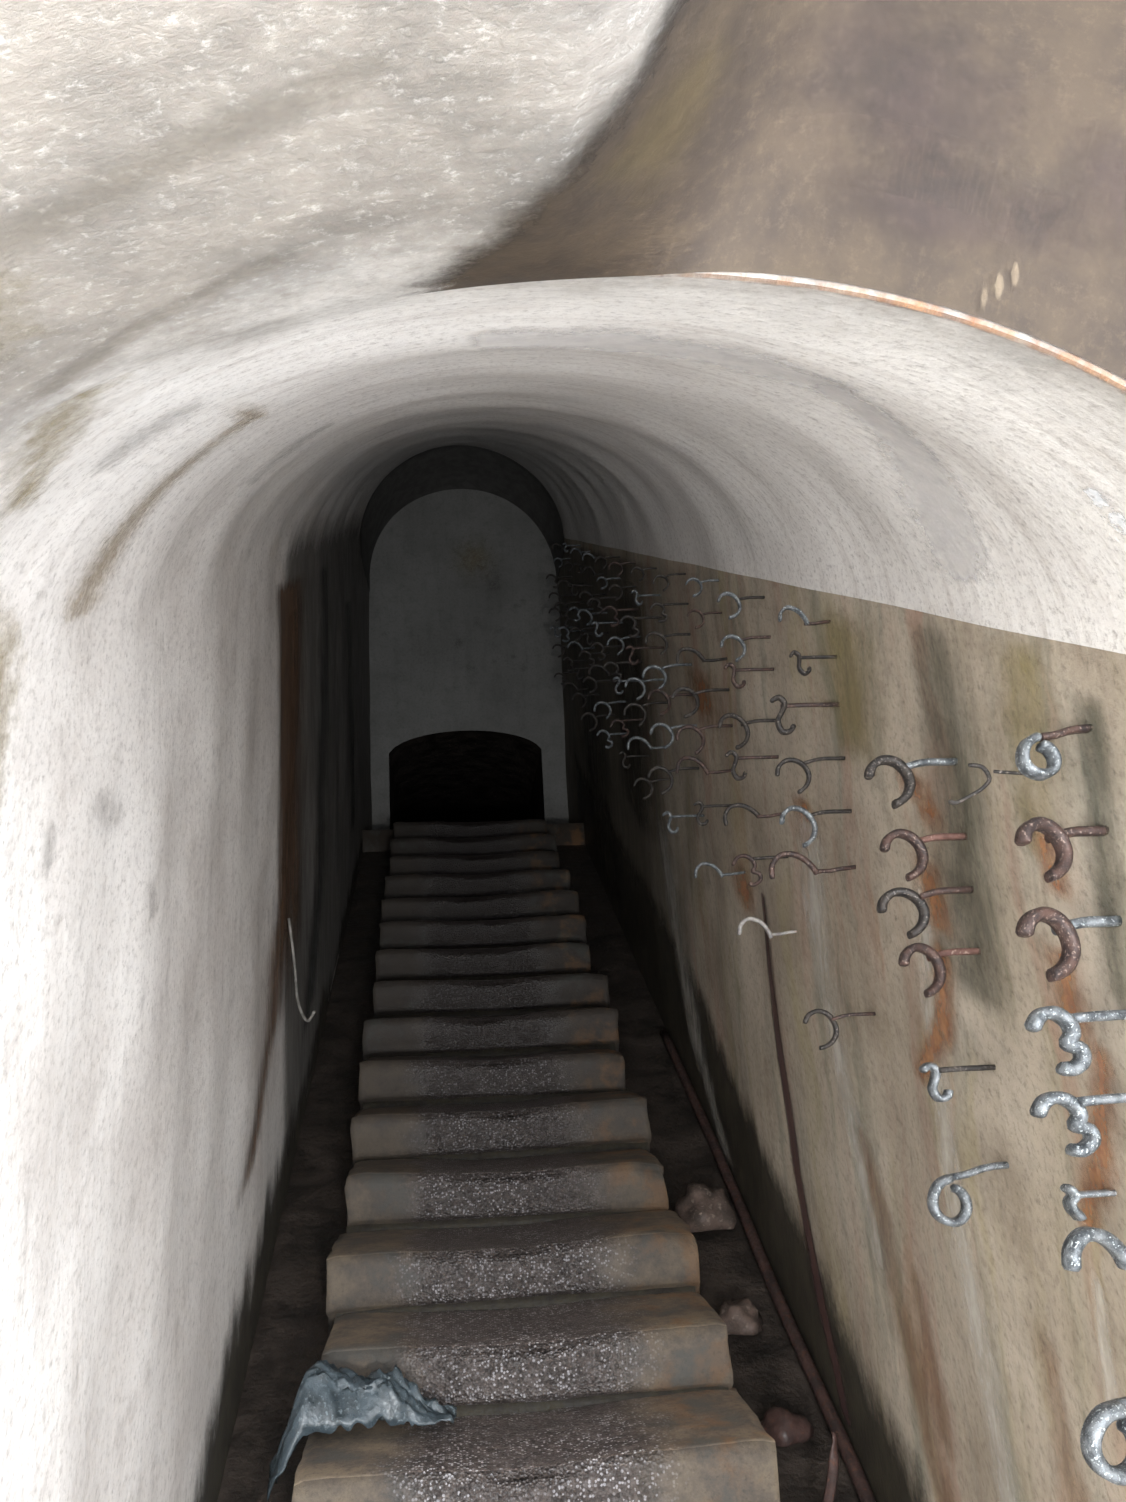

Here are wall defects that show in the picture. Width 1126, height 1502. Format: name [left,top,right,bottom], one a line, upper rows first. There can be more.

corrosion [858,293,942,317]
corrosion [962,317,1015,339]
corrosion [1031,345,1125,390]
corrosion [918,946,952,1080]
corrosion [1056,952,1084,1033]
corrosion [1082,1049,1110,1227]